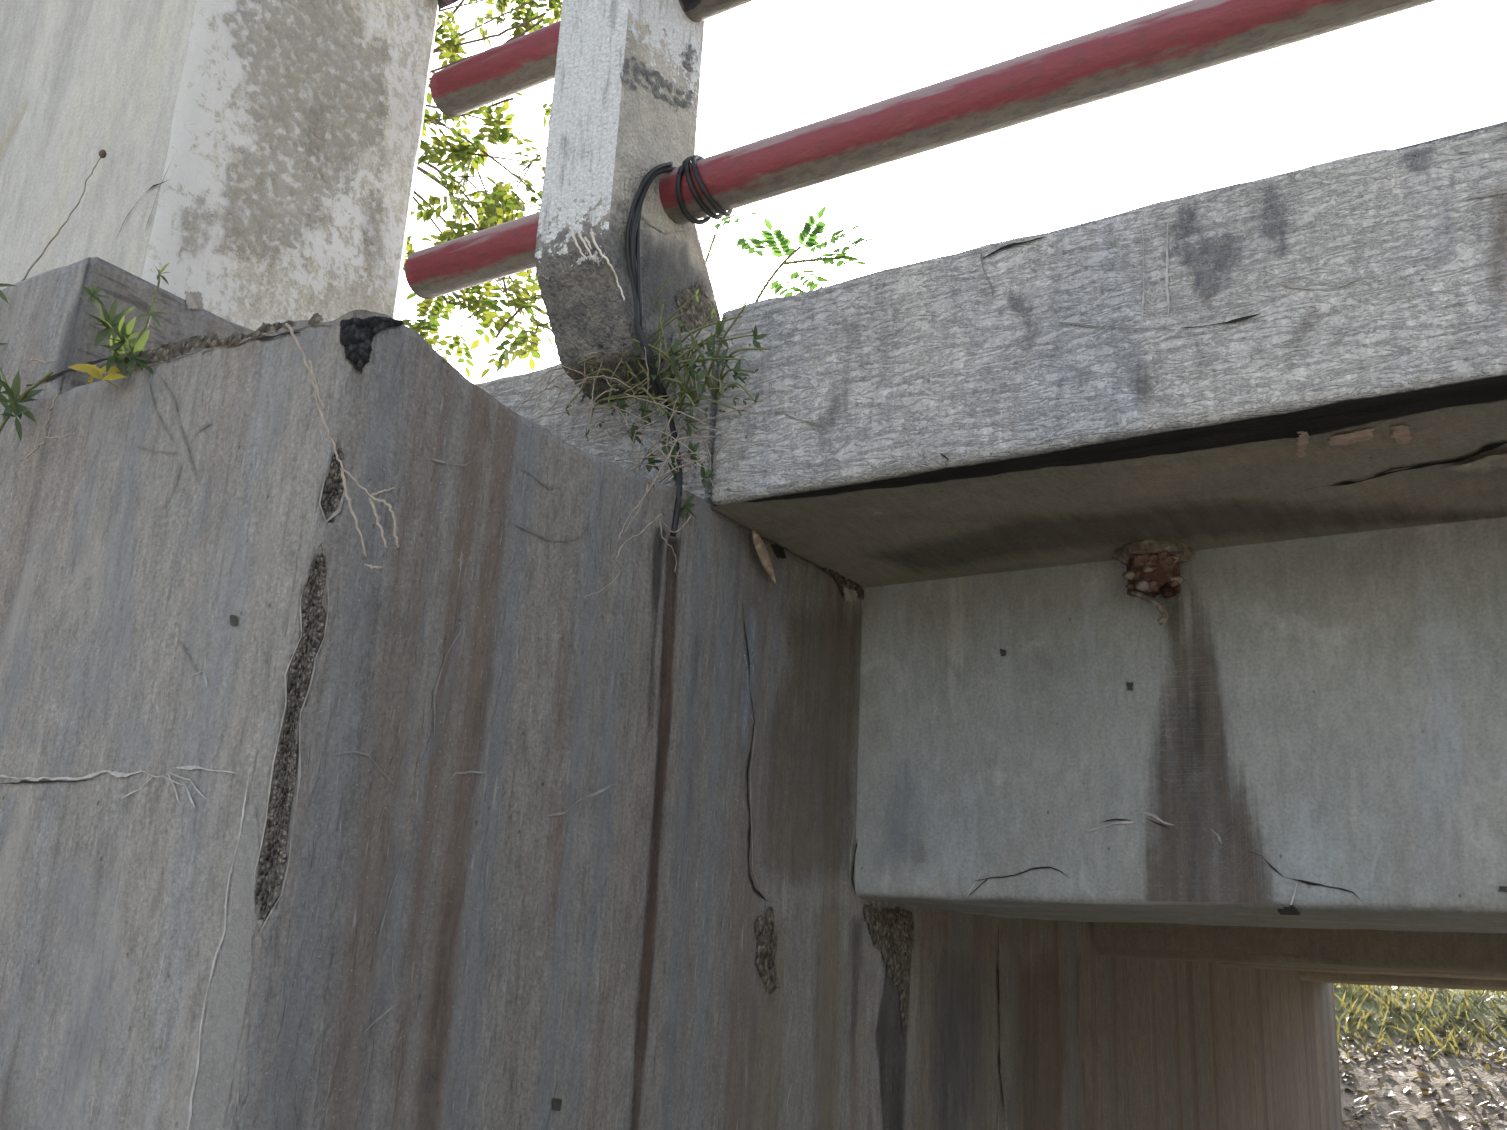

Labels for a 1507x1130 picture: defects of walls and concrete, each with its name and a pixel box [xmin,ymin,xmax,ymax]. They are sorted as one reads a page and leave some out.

peeling [681,0,701,12]
crack [0,313,331,518]
spalling [319,443,345,522]
crack [1305,441,1507,490]
spalling [253,543,329,936]
crack [742,604,774,902]
leakage [1148,599,1270,903]
crack [967,867,1069,896]
crack [1212,830,1362,915]
crack [0,766,249,1130]
spalling [755,907,780,995]
spalling [864,904,915,1035]